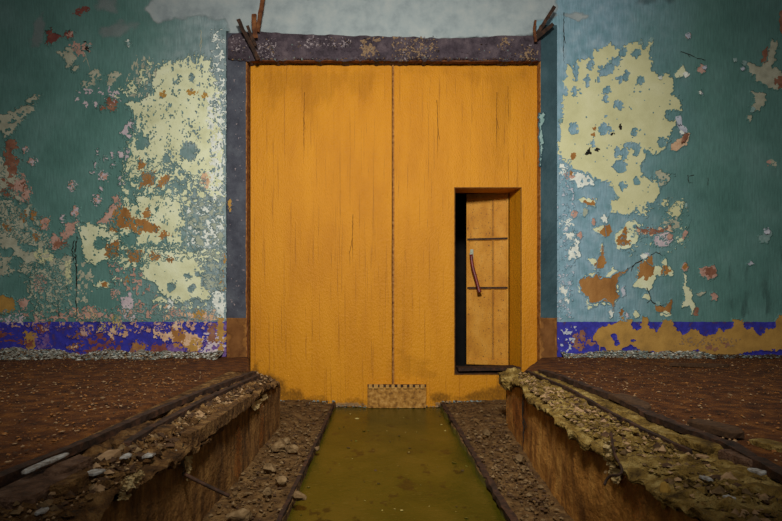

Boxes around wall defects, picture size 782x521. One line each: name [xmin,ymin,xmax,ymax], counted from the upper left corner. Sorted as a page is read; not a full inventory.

peeling [0,26,247,357]
peeling [557,37,782,355]
peeling [733,10,782,123]